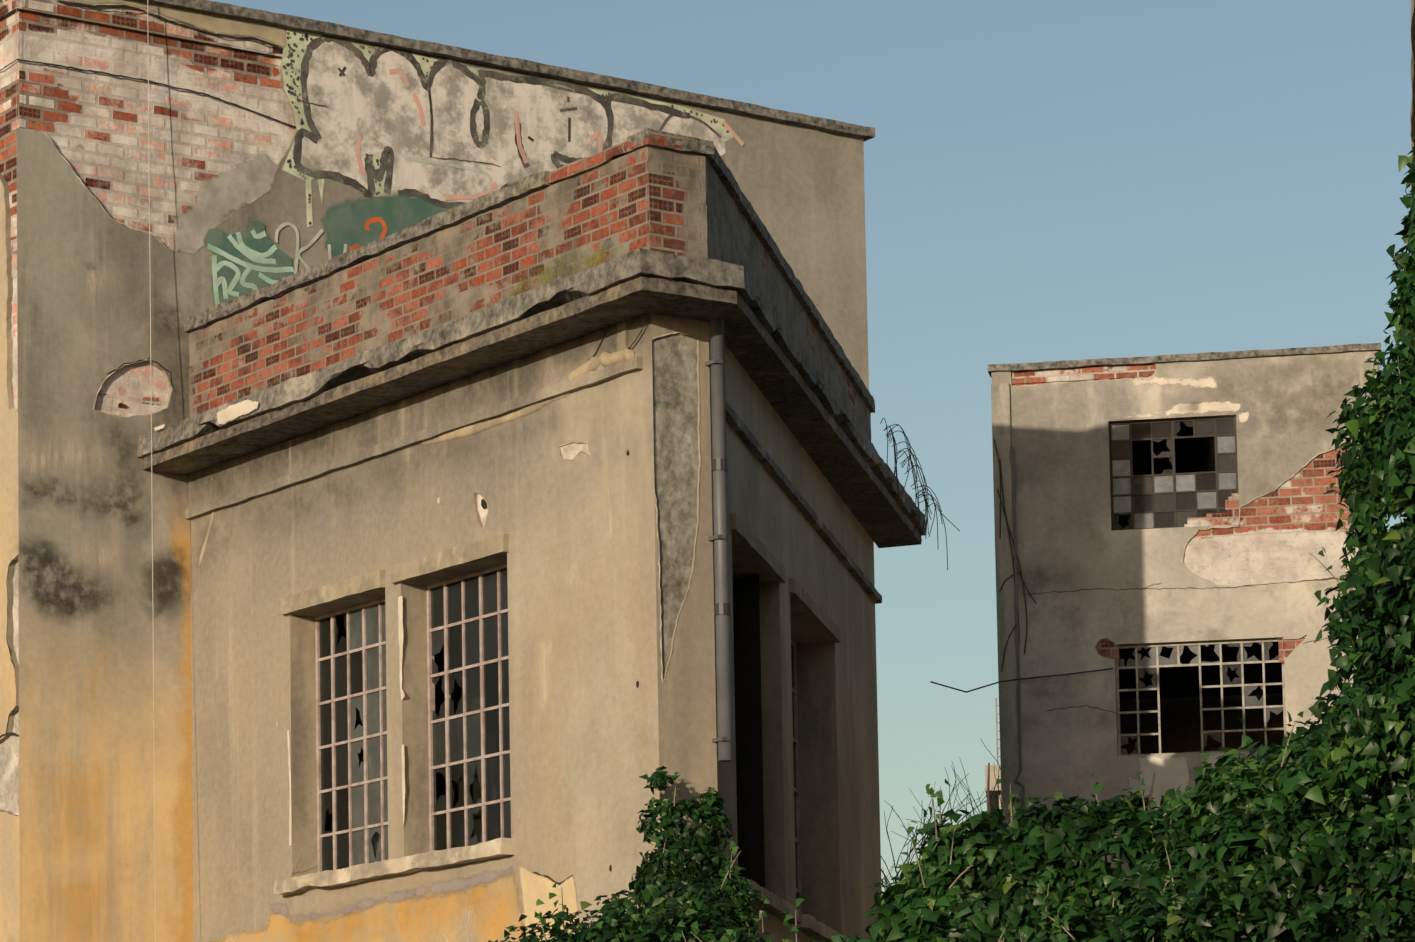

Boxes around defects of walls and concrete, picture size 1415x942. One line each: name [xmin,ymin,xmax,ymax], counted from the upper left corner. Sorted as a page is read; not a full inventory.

flaking render [0,0,296,418]
flaking render [1183,442,1360,587]
flaking render [7,554,19,686]
damp [150,559,182,611]
flaking render [1095,637,1119,663]
flaking render [1278,635,1308,662]
flaking render [0,707,20,817]
peeling [219,867,581,942]